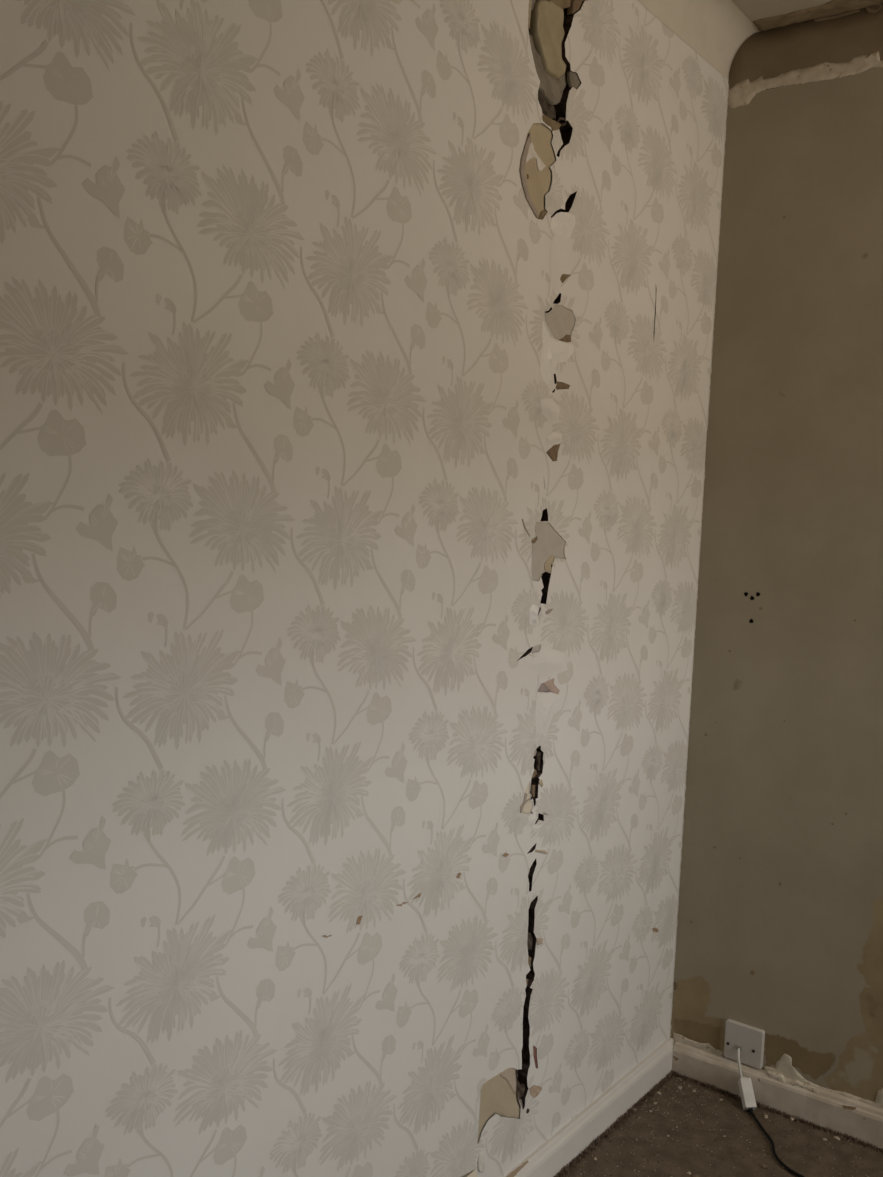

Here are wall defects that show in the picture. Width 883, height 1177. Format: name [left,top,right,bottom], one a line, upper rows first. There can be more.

flaking render [528,0,586,131]
crack [547,117,573,158]
peeling [526,142,545,171]
crack [544,191,577,218]
crack [545,293,561,313]
crack [540,508,548,521]
crack [538,565,553,615]
crack [517,647,533,661]
crack [516,746,544,1109]